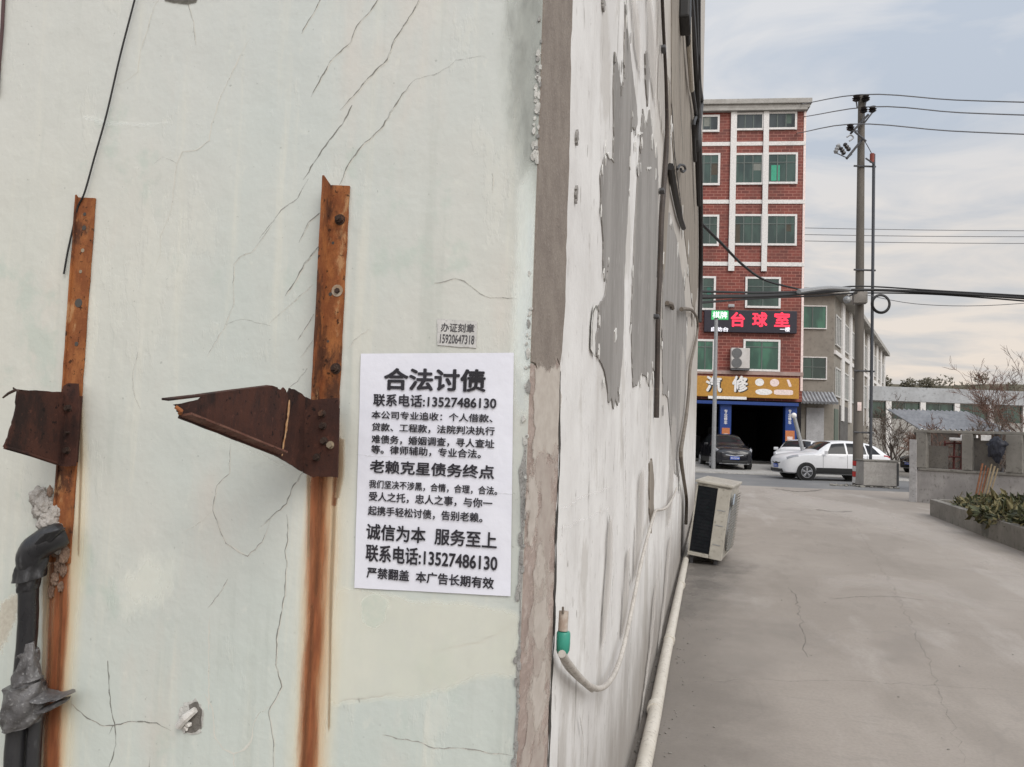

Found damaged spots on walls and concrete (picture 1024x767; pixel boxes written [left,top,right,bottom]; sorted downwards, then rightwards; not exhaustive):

crack [208,0,420,356]
crack [435,278,517,299]
peeling [511,0,579,767]
peeling [591,0,699,491]
corrosion [41,415,82,767]
crack [69,661,171,766]
spalling [175,698,204,735]
crack [186,450,302,767]
corrosion [300,439,343,767]